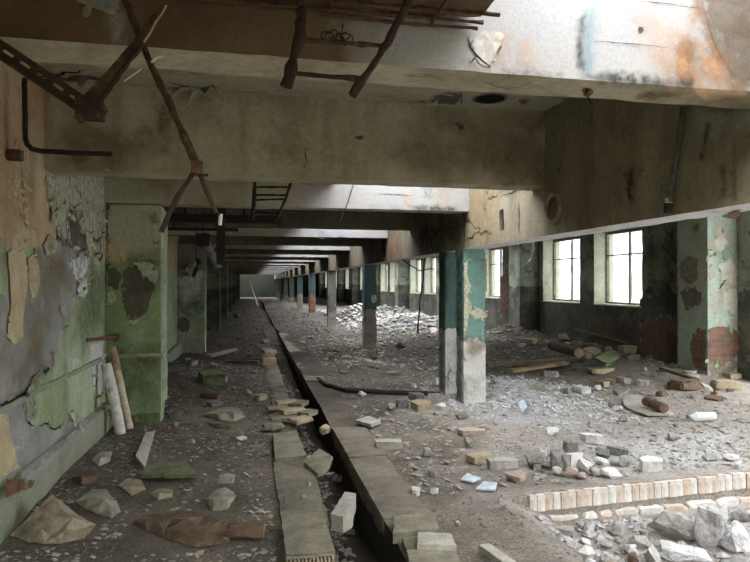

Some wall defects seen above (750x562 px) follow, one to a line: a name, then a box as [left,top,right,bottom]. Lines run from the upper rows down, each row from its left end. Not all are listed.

peeling [0,160,158,498]